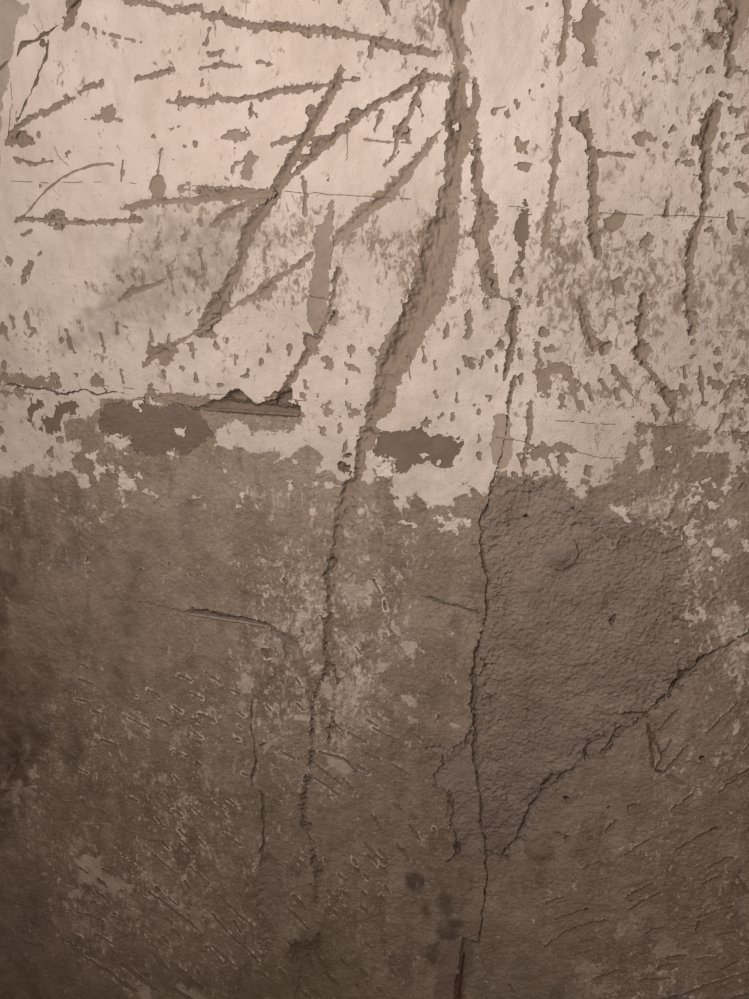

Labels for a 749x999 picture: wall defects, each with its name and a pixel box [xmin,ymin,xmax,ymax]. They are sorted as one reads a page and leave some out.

peeling [0,0,41,164]
peeling [149,101,259,200]
peeling [572,0,606,67]
peeling [568,108,677,159]
crack [0,383,159,399]
peeling [142,292,230,407]
crack [188,393,307,410]
peeling [518,326,634,411]
peeling [677,339,749,453]
crack [297,557,342,903]
spalling [425,413,720,857]
crack [424,415,749,943]